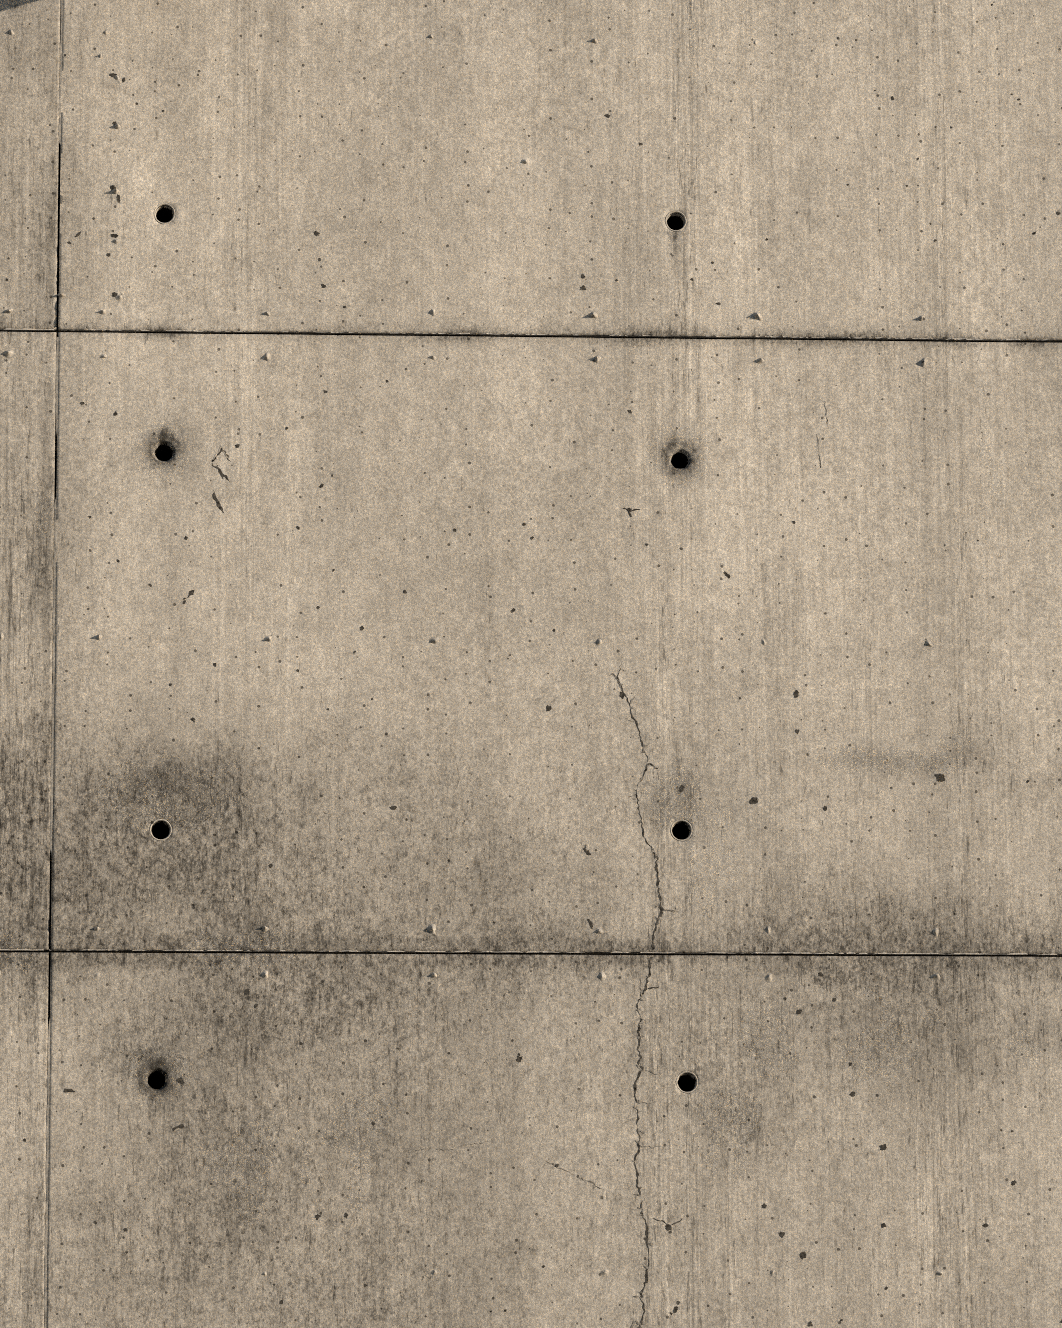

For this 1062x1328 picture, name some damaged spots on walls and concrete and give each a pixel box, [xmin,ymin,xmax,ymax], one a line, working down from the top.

crack [609,668,678,1328]